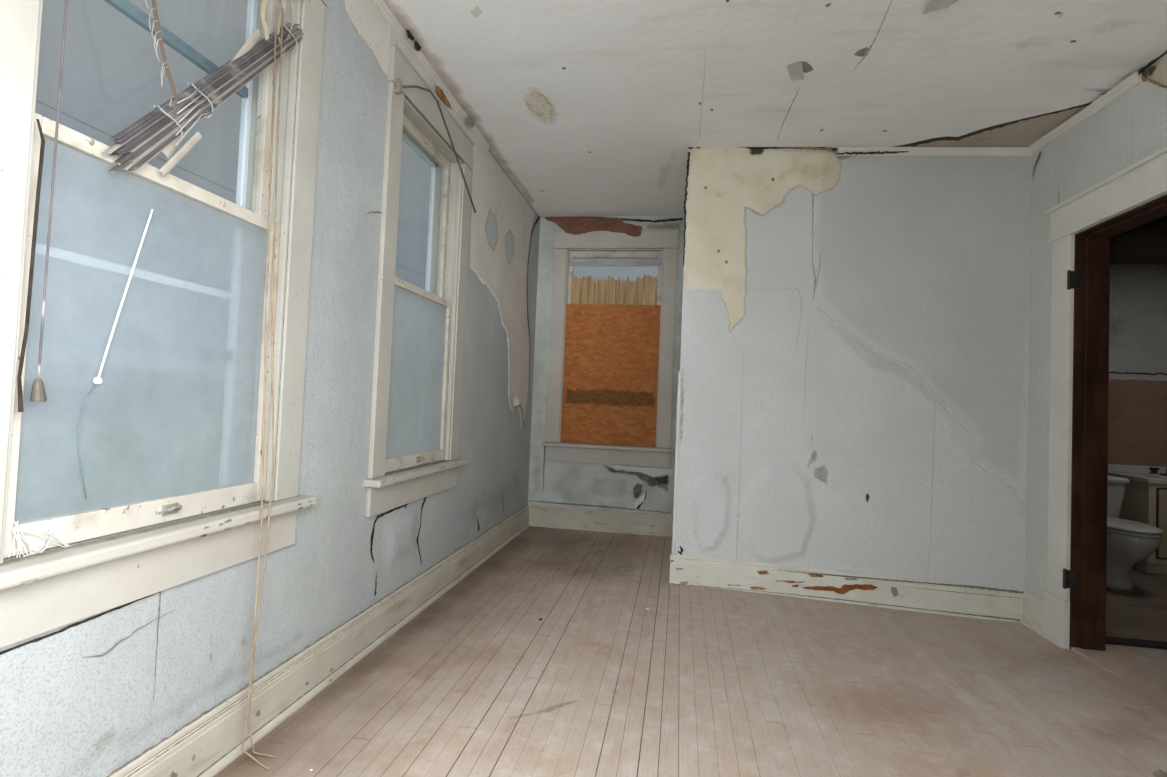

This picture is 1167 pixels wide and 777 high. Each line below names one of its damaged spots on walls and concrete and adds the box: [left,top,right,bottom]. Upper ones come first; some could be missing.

crack [854,0,892,70]
peeling [922,0,958,14]
crack [0,592,159,655]
crack [107,500,670,777]